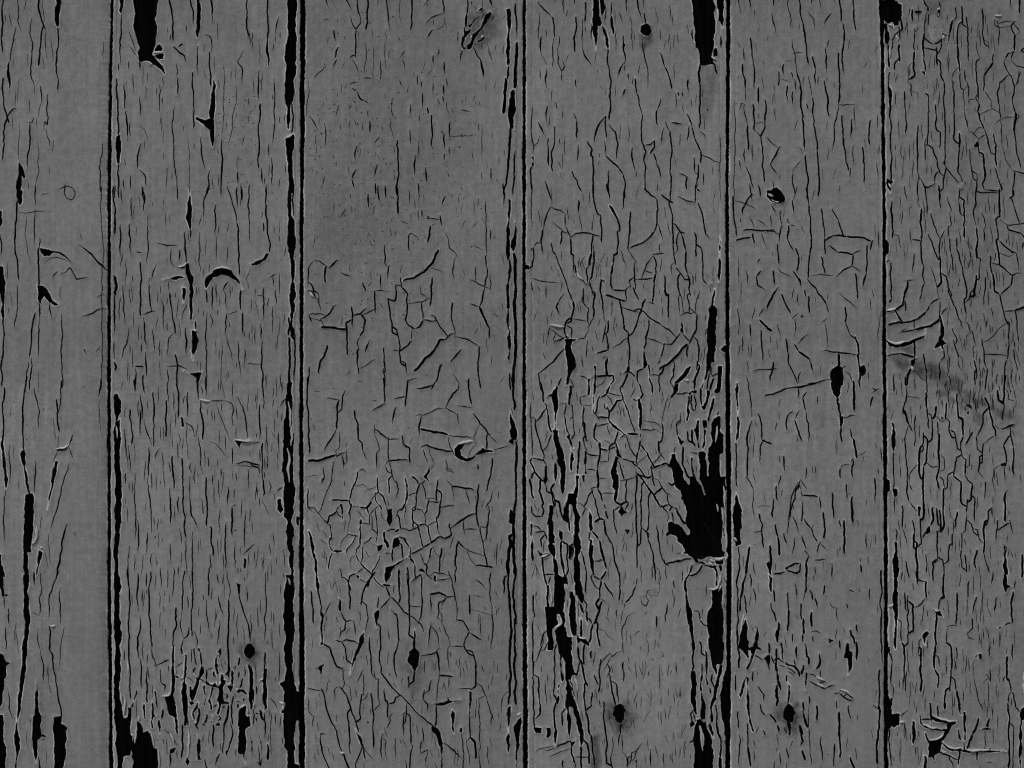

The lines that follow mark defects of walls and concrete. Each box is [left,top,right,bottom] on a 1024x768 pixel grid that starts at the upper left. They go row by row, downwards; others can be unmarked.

peeling [119,0,165,74]
peeling [691,0,724,128]
crack [0,0,286,768]
peeling [113,394,267,768]
peeling [530,241,783,768]
crack [306,0,1024,768]
peeling [899,720,962,768]